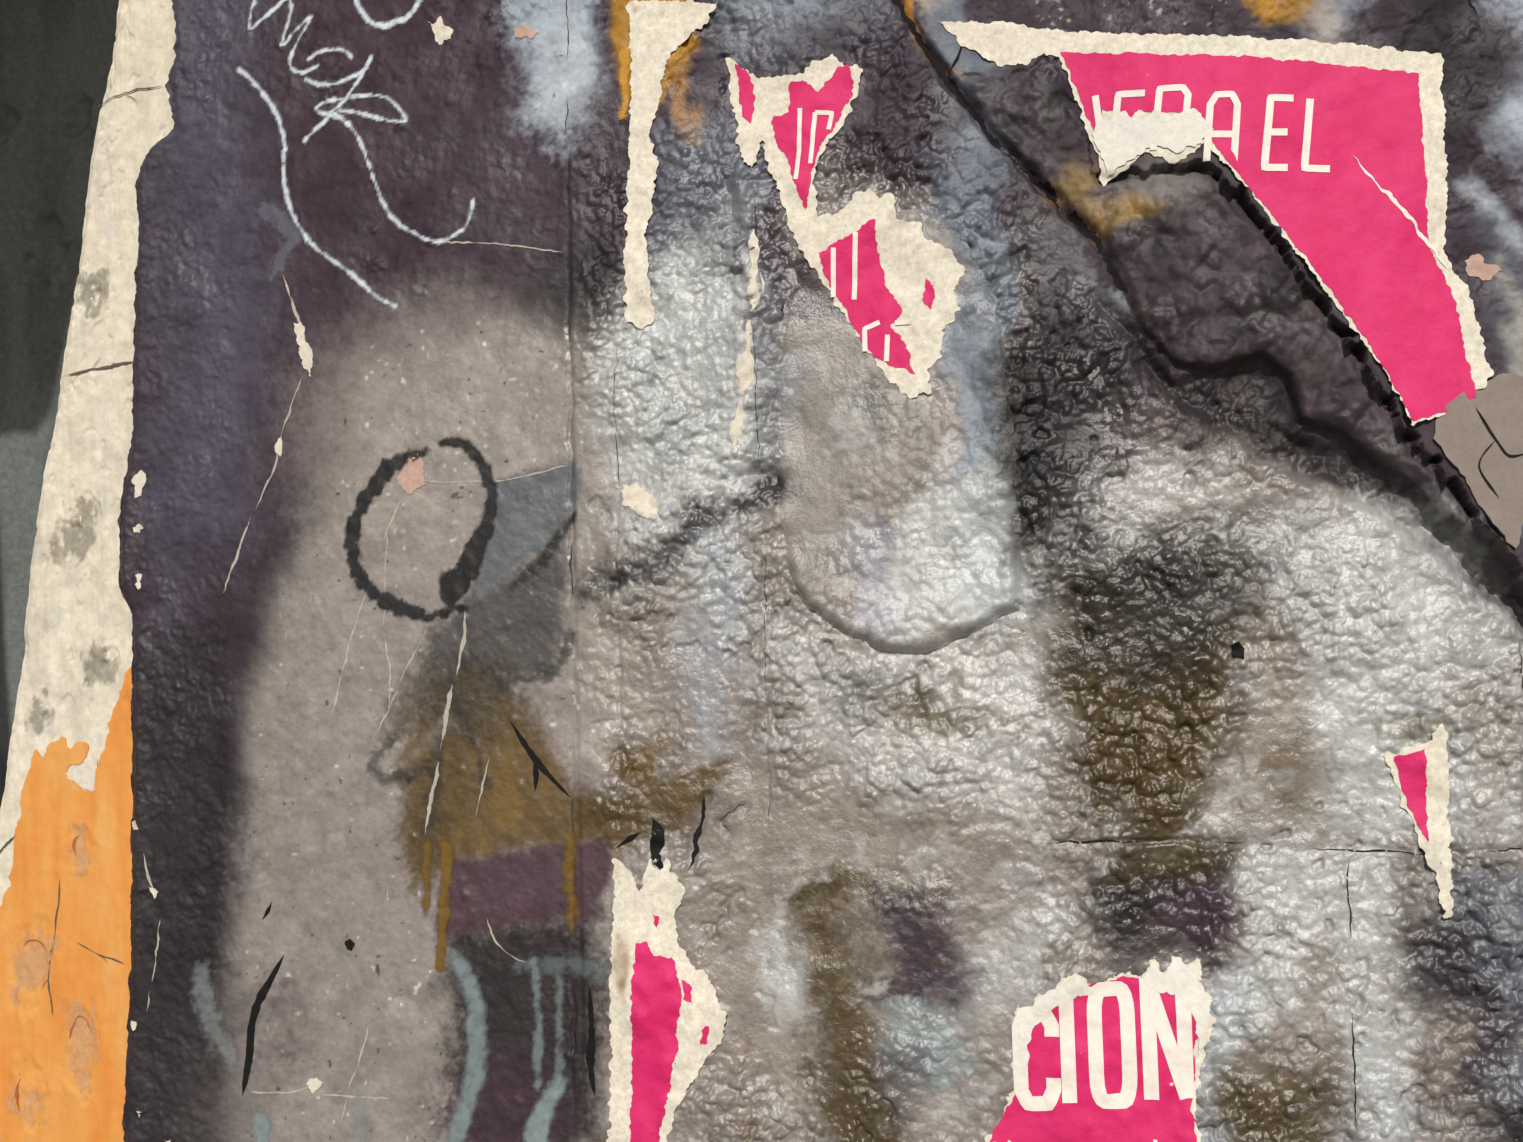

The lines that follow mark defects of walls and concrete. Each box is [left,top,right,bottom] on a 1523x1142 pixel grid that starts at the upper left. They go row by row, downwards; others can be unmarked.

crack [892,0,1128,293]
peeling [730,320,755,449]
flaking render [950,63,1523,558]
peeling [0,667,159,1142]
peeling [306,1077,323,1093]